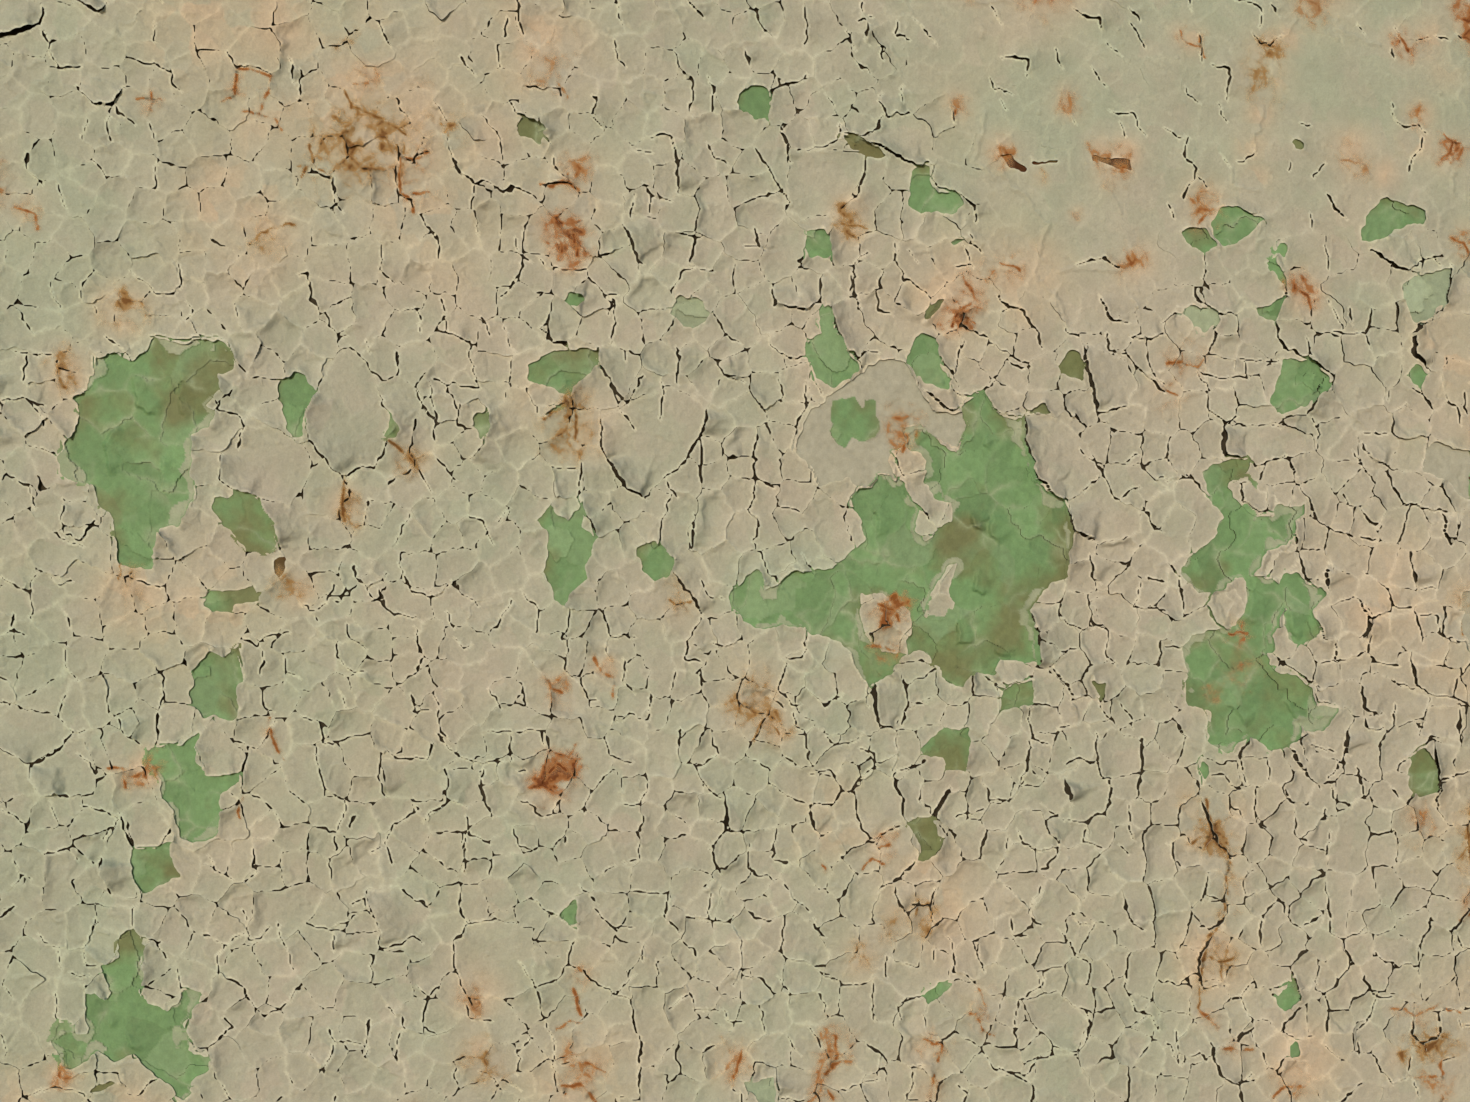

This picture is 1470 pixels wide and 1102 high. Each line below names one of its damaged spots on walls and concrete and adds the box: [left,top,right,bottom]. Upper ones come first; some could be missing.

crack [0,7,44,38]
rust [1453,0,1470,44]
rust [297,90,429,213]
crack [577,409,707,533]
peeling [502,109,1470,920]
crack [1198,325,1353,538]
rust [871,592,911,660]
peeling [0,268,705,1102]
rust [527,744,582,795]
crack [809,769,869,843]
peeling [780,861,840,966]
peeling [1321,870,1356,938]